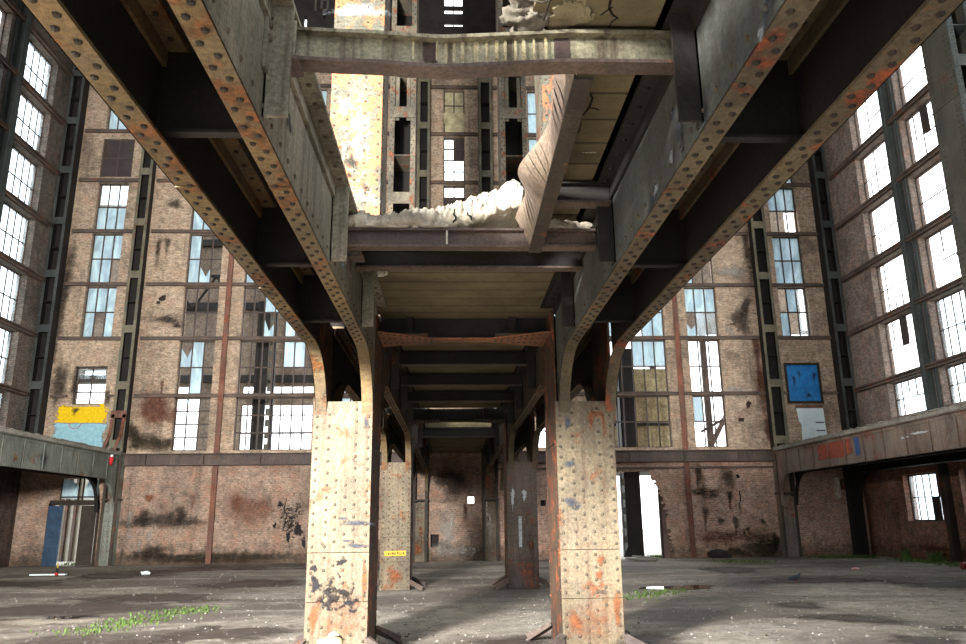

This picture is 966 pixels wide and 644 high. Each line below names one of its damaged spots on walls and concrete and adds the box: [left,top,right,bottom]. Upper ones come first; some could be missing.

spalling [499,0,595,32]
crack [600,0,618,28]
damp [723,471,741,528]
peeling [309,559,365,613]
rust [310,606,318,628]